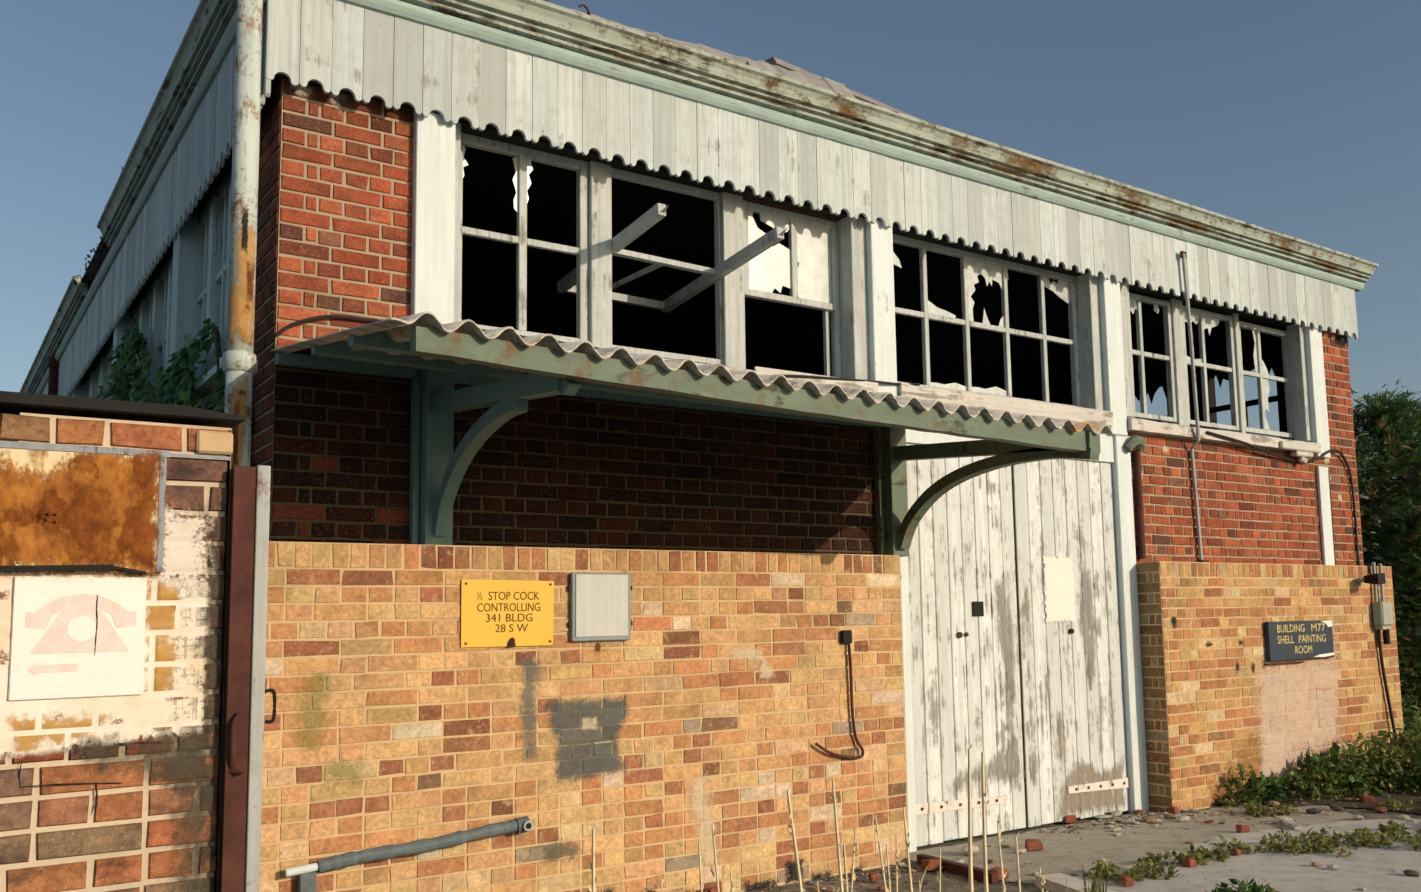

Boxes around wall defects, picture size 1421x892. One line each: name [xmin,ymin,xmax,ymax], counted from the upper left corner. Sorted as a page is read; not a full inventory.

corrosion [229,208,255,345]
corrosion [230,375,248,469]
corrosion [0,452,167,576]
peeling [0,508,212,757]
leakage [520,660,539,756]
peeling [953,545,1125,851]